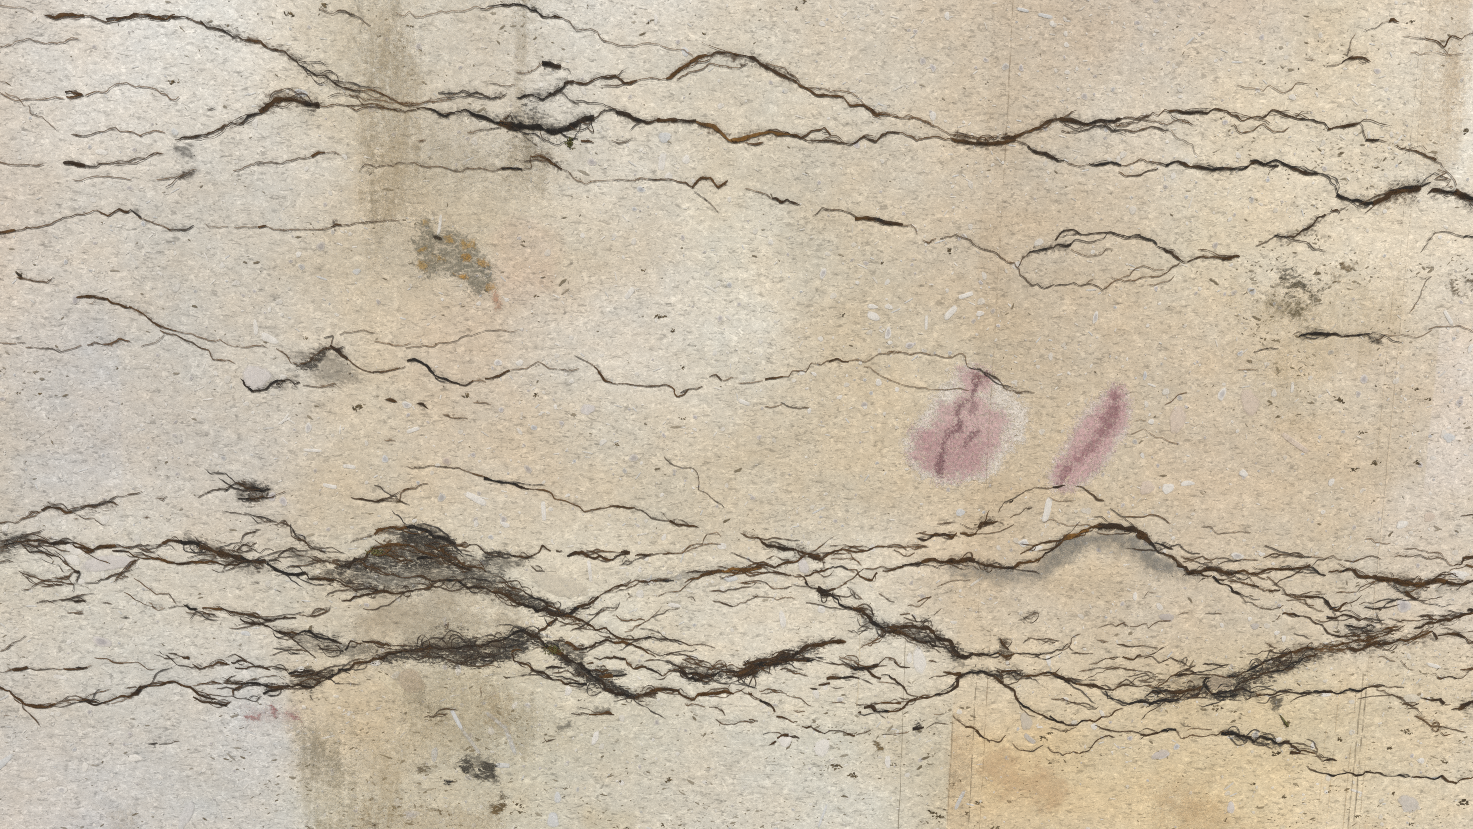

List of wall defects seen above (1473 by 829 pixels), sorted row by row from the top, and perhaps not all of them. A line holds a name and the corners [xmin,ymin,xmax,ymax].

crack [0,273,1034,421]
crack [0,3,1473,370]
crack [1132,392,1187,444]
crack [0,438,1473,784]